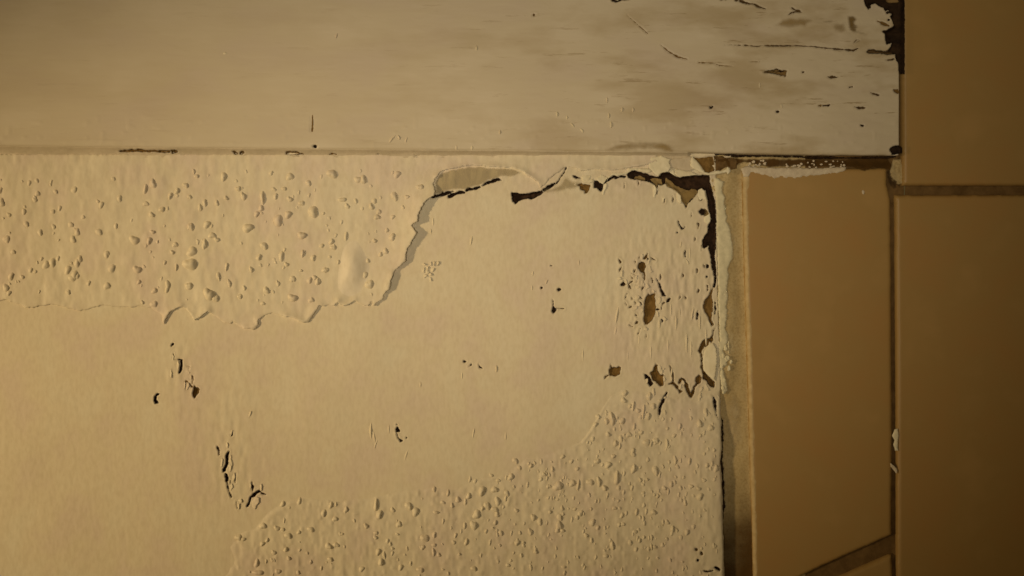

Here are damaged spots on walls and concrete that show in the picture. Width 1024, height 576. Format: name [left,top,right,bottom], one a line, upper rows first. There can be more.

spalling [864,0,905,74]
peeling [558,156,737,204]
peeling [617,254,666,331]
spalling [703,289,716,326]
spalling [645,365,685,396]
peeling [697,343,717,401]
peeling [220,430,262,509]